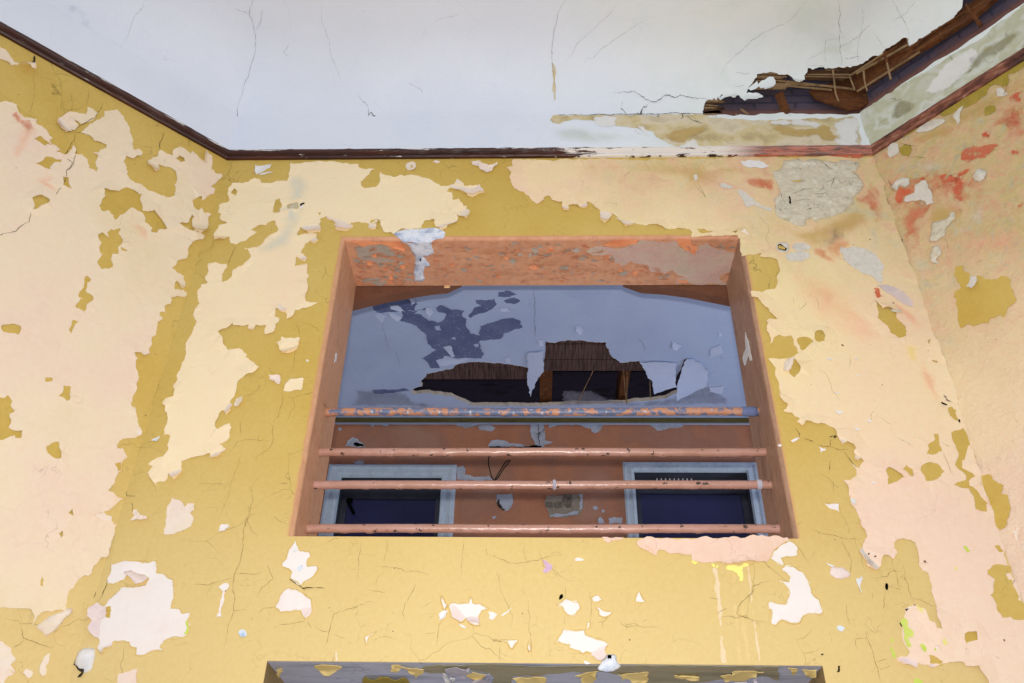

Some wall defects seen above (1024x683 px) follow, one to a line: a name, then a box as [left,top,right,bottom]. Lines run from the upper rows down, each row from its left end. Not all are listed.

crack [552,5,711,139]
damp [664,126,705,143]
peeling [0,101,485,683]
peeling [373,291,522,368]
peeling [456,4,1024,683]
crack [201,326,418,649]
crack [799,517,930,678]